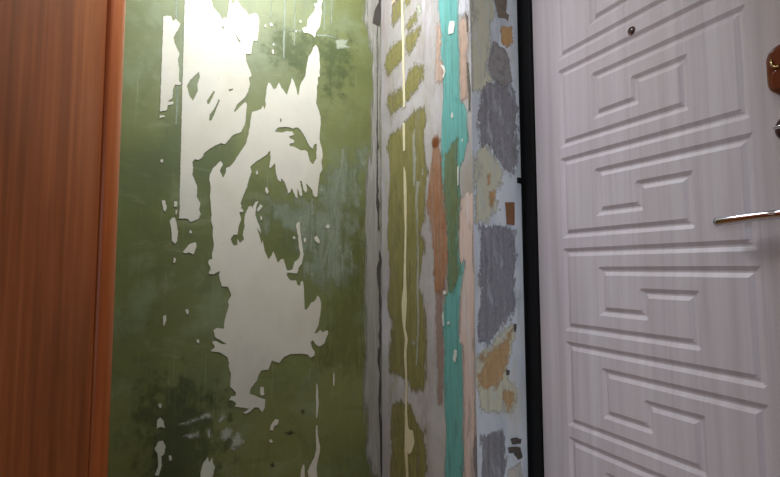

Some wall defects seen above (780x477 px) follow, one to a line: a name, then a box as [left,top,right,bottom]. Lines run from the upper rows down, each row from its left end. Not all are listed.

peeling [295,0,323,38]
spalling [494,0,509,21]
peeling [160,16,181,118]
spalling [488,41,512,87]
peeling [162,200,178,243]
peeling [183,230,197,254]
peeling [155,441,172,476]
peeling [200,457,215,477]
peeling [300,384,320,477]
spalling [508,437,523,460]